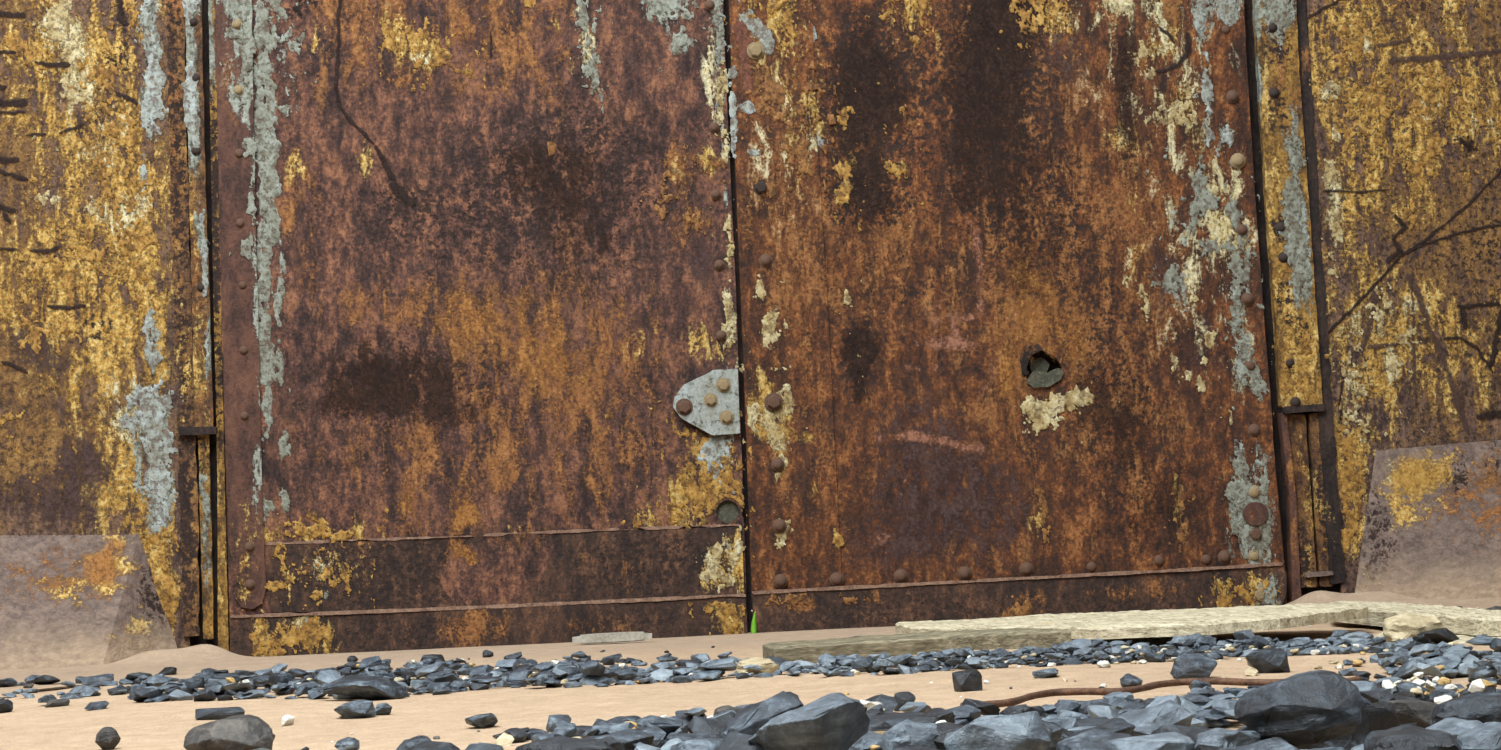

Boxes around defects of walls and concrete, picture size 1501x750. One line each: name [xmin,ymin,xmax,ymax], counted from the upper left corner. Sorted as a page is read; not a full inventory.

crack [0,11,84,253]
crack [47,303,86,311]
peeling [0,0,200,633]
crack [117,0,128,26]
crack [115,92,139,105]
peeling [219,0,317,460]
rust [316,288,602,429]
rust [826,17,917,232]
peeling [1014,381,1095,436]
rust [941,0,1207,550]
peeling [1122,0,1426,564]
rust [450,474,480,566]